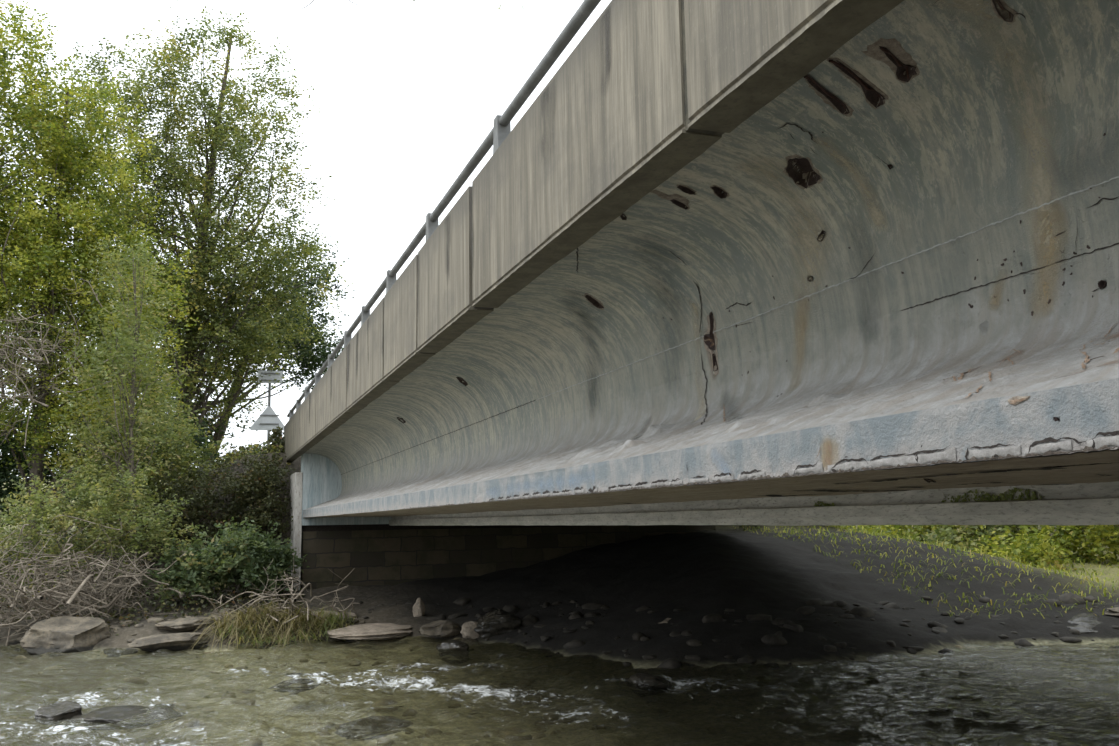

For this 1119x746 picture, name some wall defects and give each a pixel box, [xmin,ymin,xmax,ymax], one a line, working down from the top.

spalling [991,0,1026,24]
spalling [861,38,920,83]
spalling [804,74,854,117]
spalling [827,58,889,109]
hole [783,154,823,190]
rust [701,312,719,425]
crack [1080,323,1119,369]